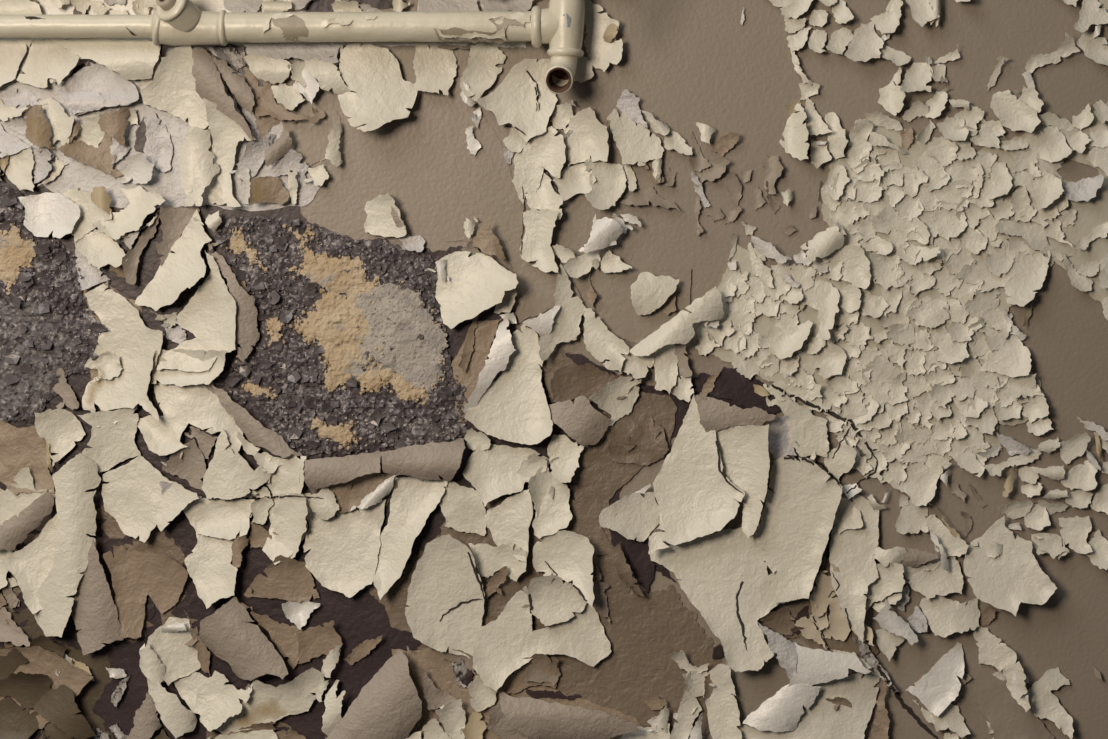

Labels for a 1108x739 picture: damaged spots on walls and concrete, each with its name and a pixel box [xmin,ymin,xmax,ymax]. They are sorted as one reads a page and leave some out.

peeling [0,0,157,15]
peeling [190,0,534,33]
peeling [436,28,507,41]
peeling [573,0,623,83]
peeling [769,0,848,169]
peeling [808,0,960,116]
peeling [1074,0,1108,66]
spalling [0,37,724,739]
peeling [547,32,1108,739]